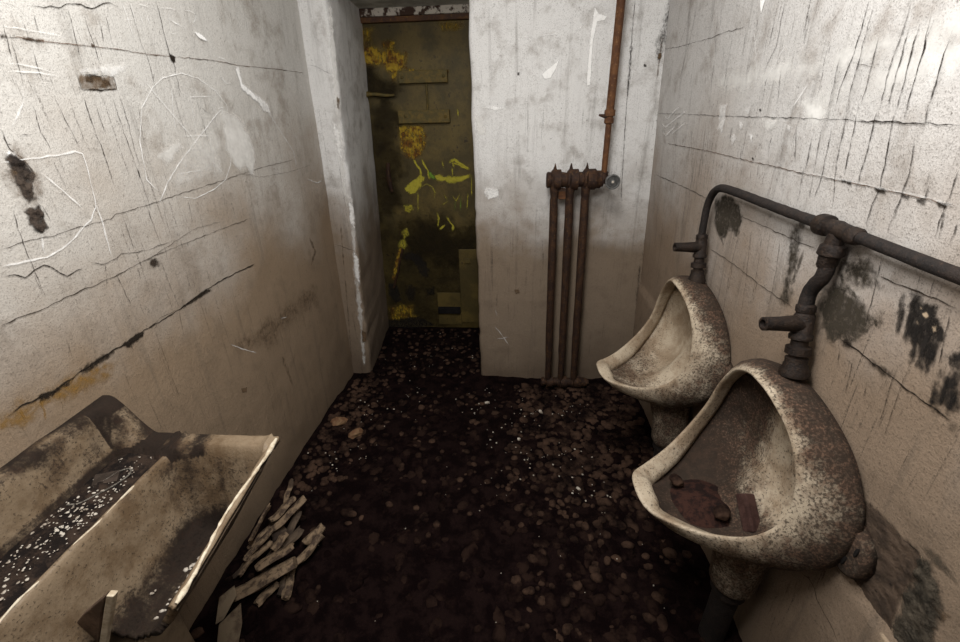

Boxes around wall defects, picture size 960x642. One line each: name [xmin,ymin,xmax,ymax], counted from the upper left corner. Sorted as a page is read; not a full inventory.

crack [24,1,112,9]
spalling [86,75,111,88]
crack [1,6,328,92]
crack [662,109,953,125]
spalling [4,136,49,232]
crack [672,144,952,208]
crack [6,219,247,324]
crack [15,264,254,411]
water stain [714,195,742,304]
water stain [744,223,804,304]
water stain [819,259,881,346]
water stain [896,297,951,366]